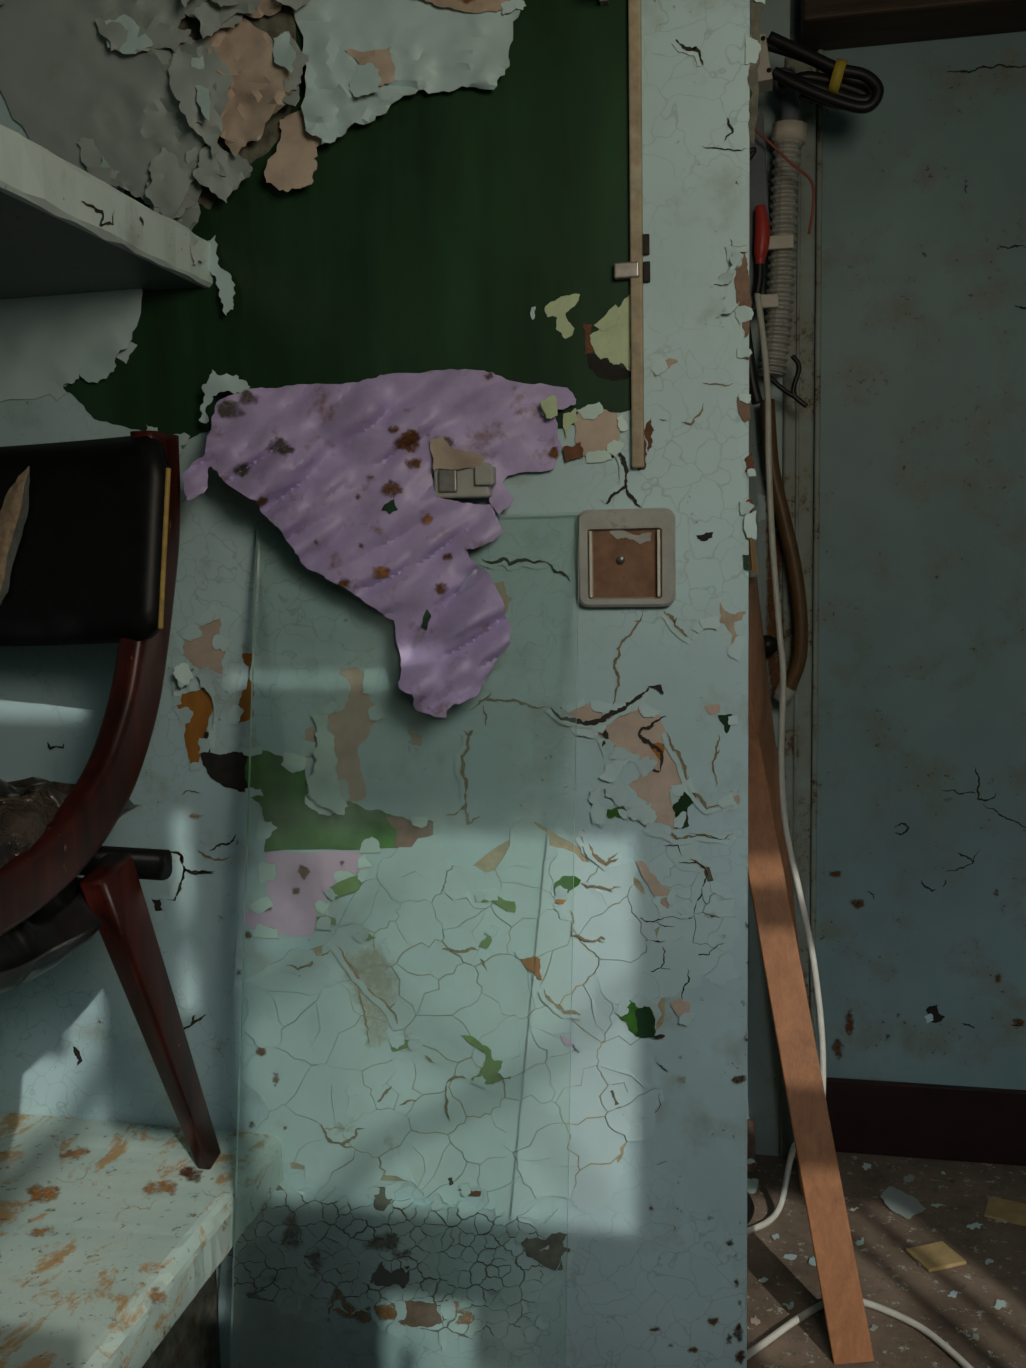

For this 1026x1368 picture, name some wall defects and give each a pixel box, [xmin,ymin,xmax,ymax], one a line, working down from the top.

peeling [711,238,754,360]
peeling [0,0,654,746]
crack [479,557,570,581]
peeling [171,604,433,939]
peeling [562,699,697,835]
crack [942,768,1026,828]
crack [217,609,740,1352]
crack [184,1014,207,1030]
rust [366,1233,410,1257]
rust [328,1289,397,1323]
rust [454,1301,474,1324]
rust [708,1318,745,1364]